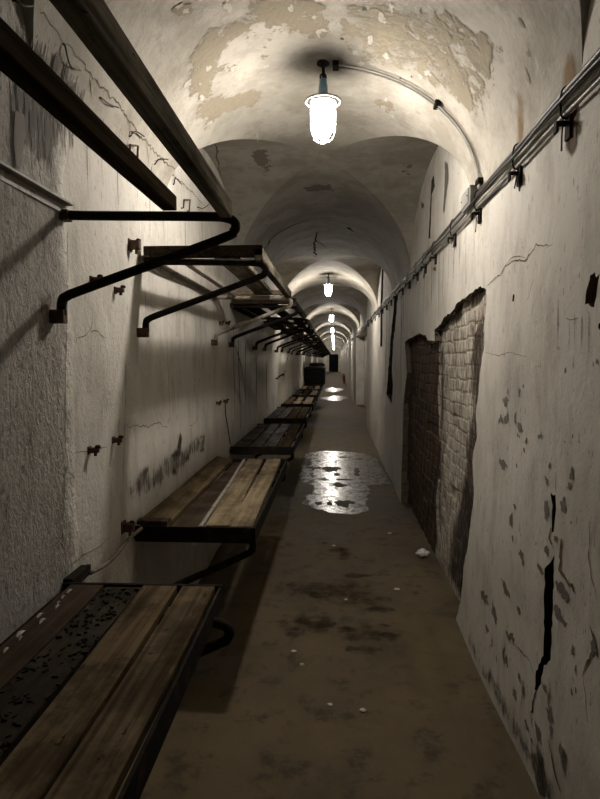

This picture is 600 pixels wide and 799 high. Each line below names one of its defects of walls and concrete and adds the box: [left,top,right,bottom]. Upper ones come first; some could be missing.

peeling [184,0,509,129]
crack [40,12,201,203]
crack [487,243,553,286]
spalling [585,272,599,307]
spalling [401,286,487,601]
peeling [498,389,527,453]
peeling [560,467,574,512]
peeling [481,590,497,633]
crack [516,478,598,724]
peeling [553,581,569,627]
peeling [525,707,553,758]
crack [536,740,560,796]